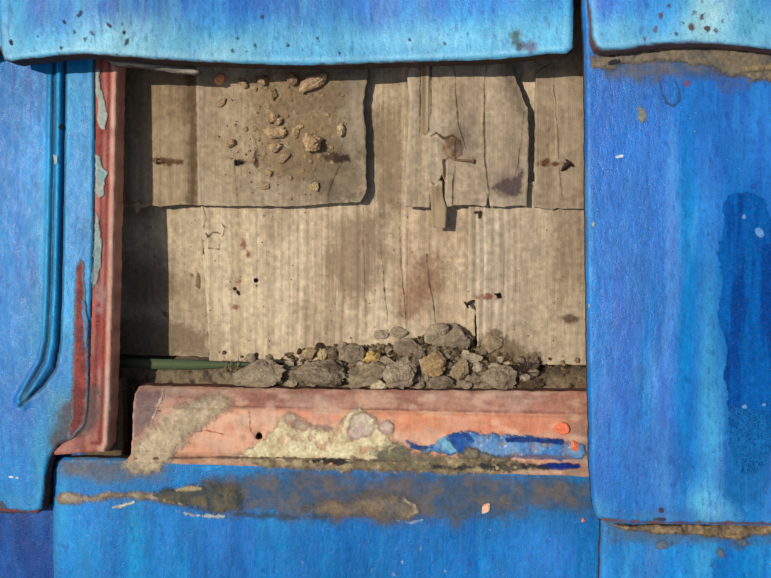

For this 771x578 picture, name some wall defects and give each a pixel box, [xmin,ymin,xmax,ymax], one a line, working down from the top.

peeling [95,154,108,198]
damp [493,171,523,196]
peeling [91,214,102,287]
damp [717,184,771,505]
peeling [554,422,579,451]